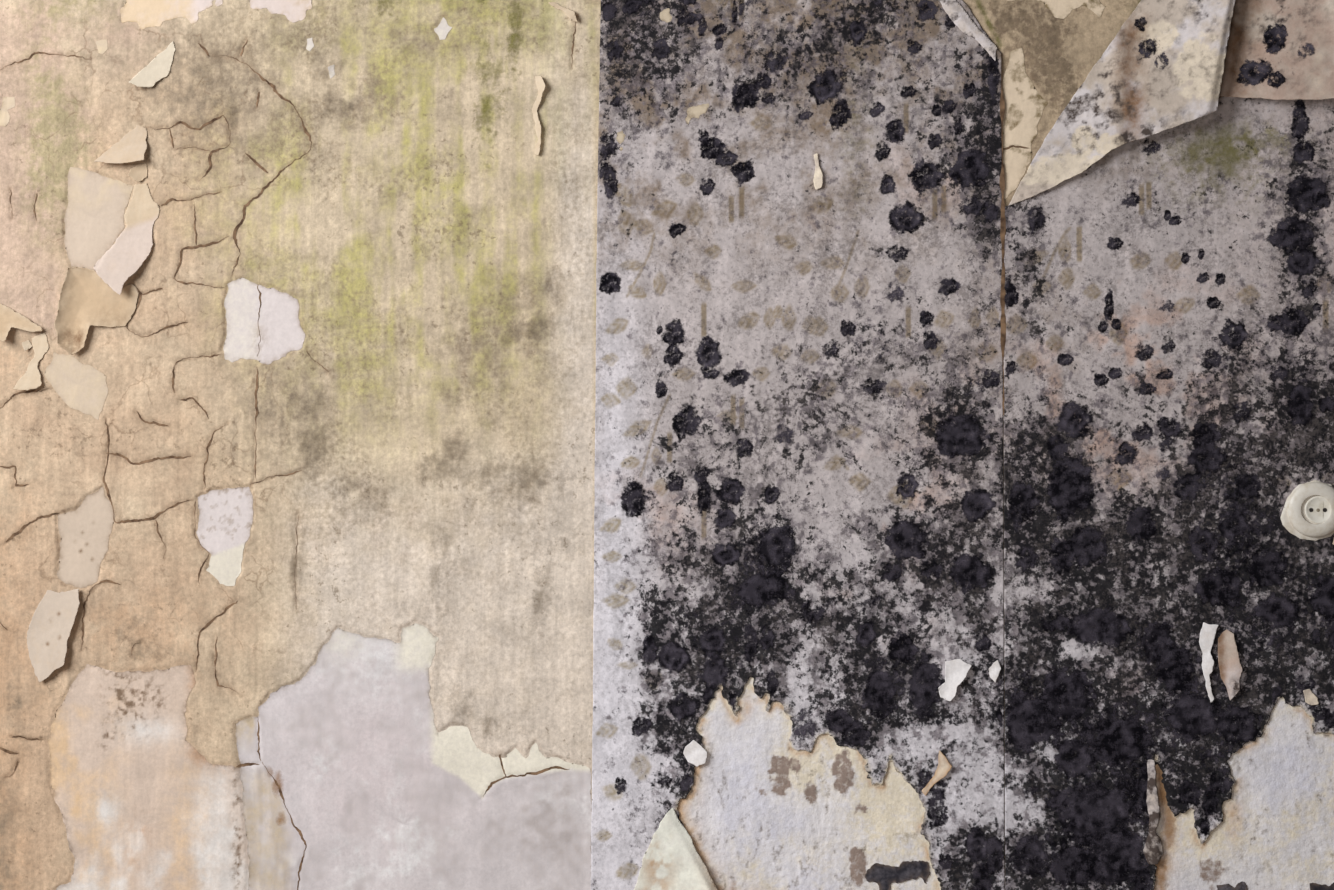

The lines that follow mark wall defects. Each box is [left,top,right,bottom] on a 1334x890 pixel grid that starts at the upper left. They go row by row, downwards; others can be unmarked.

peeling [0,125,160,420]
crack [103,354,301,581]
crack [127,41,311,337]
damp [655,319,751,398]
damp [869,57,1000,262]
damp [1181,100,1334,426]
crack [195,602,237,690]
peeling [48,623,592,890]
crack [483,755,570,796]
damp [641,460,838,722]
peeling [677,677,941,890]
peeling [1153,697,1334,890]